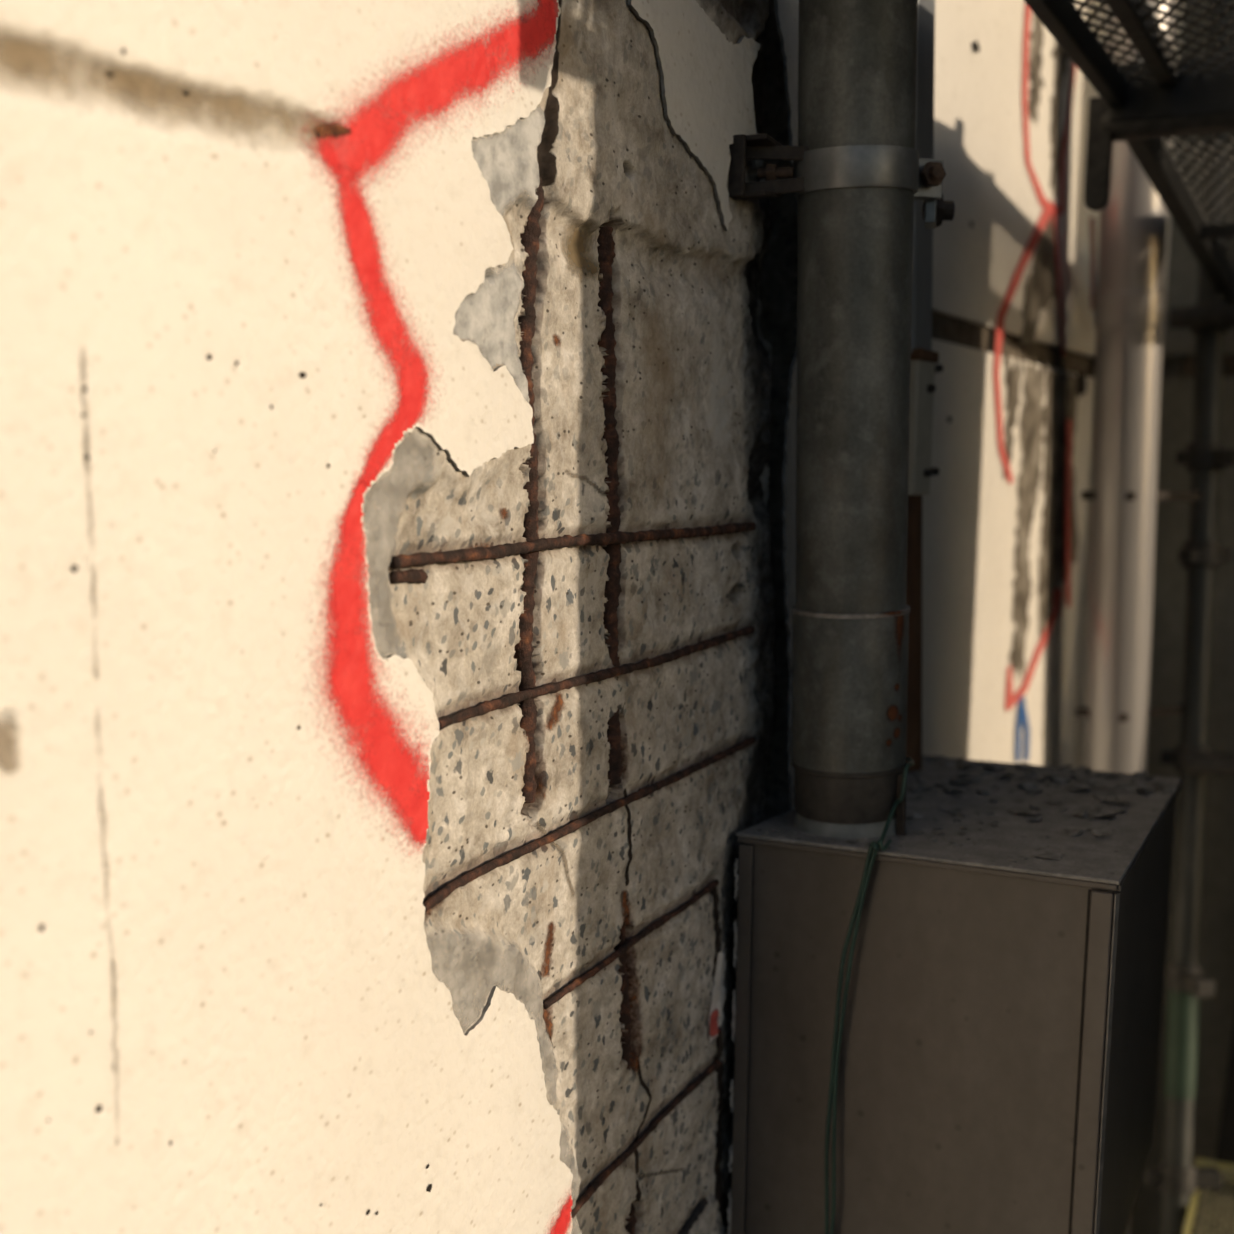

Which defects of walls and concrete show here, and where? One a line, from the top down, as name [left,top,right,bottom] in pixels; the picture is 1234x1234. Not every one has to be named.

corrosion [566,224,600,276]
spalling [363,0,776,1234]
corrosion [547,694,565,730]
crack [624,789,632,886]
corrosion [542,922,555,976]
corrosion [620,891,642,1072]
corrosion [543,999,553,1041]